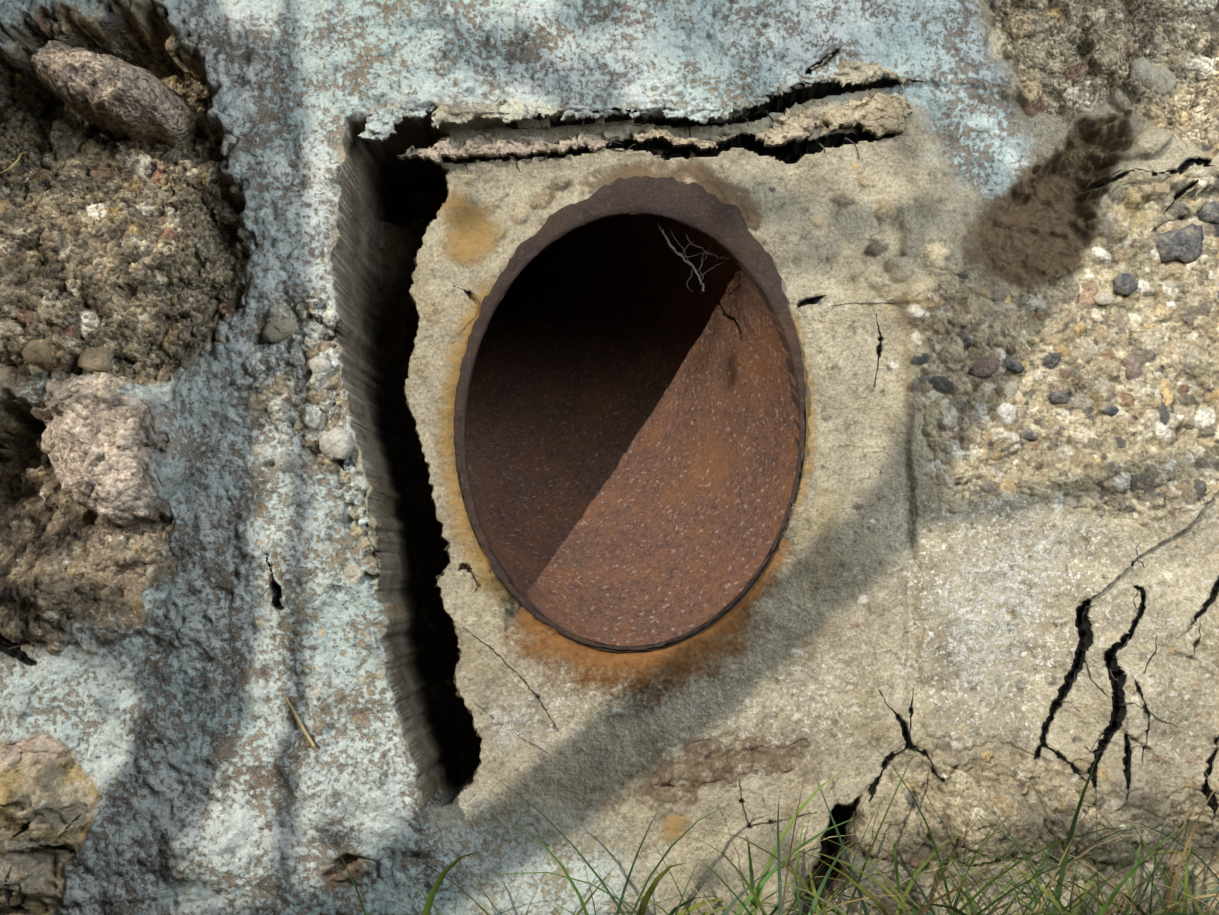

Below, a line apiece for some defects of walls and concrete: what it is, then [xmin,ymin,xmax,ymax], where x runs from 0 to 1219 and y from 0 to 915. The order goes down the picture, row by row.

rust [442,194,494,264]
peeling [358,54,913,165]
rust [581,161,762,225]
crack [427,45,923,196]
spalling [0,2,255,657]
rust [437,284,504,600]
rust [794,322,813,506]
rust [506,537,793,702]
crack [1035,490,1219,801]
spalling [647,739,809,806]
crack [869,688,946,802]
crack [1202,735,1219,816]